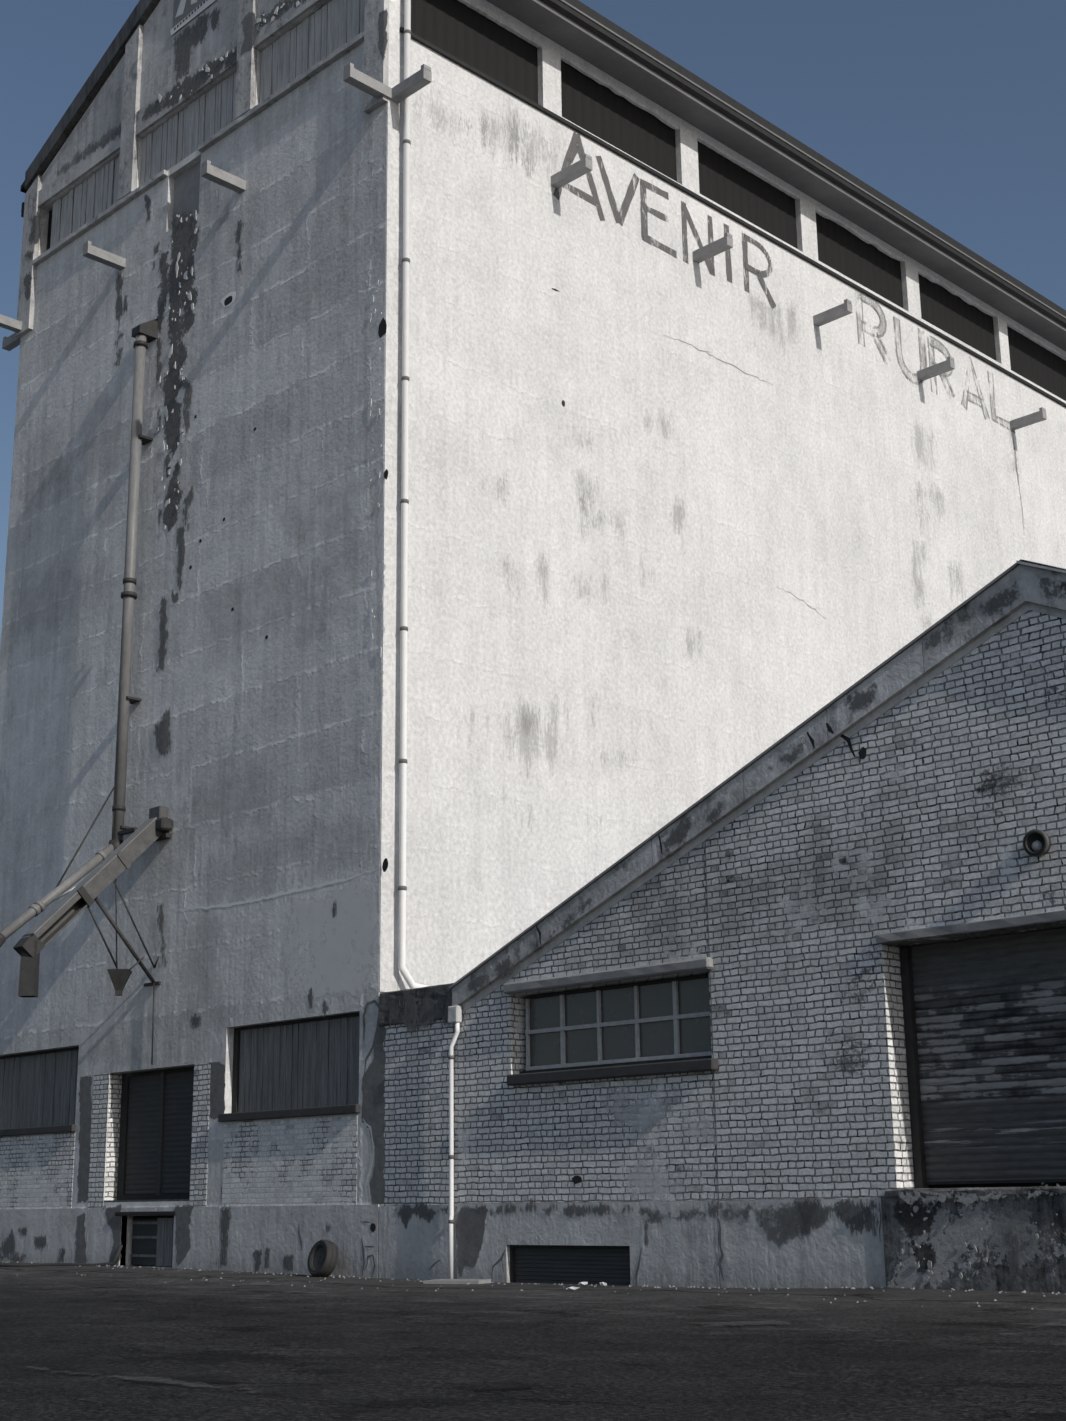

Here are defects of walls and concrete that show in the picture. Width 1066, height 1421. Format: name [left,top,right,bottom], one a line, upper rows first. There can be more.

peeling [55,0,306,176]
peeling [154,209,199,671]
peeling [153,707,172,756]
peeling [156,903,166,968]
water stain [475,1198,879,1246]
peeling [887,1183,1066,1289]